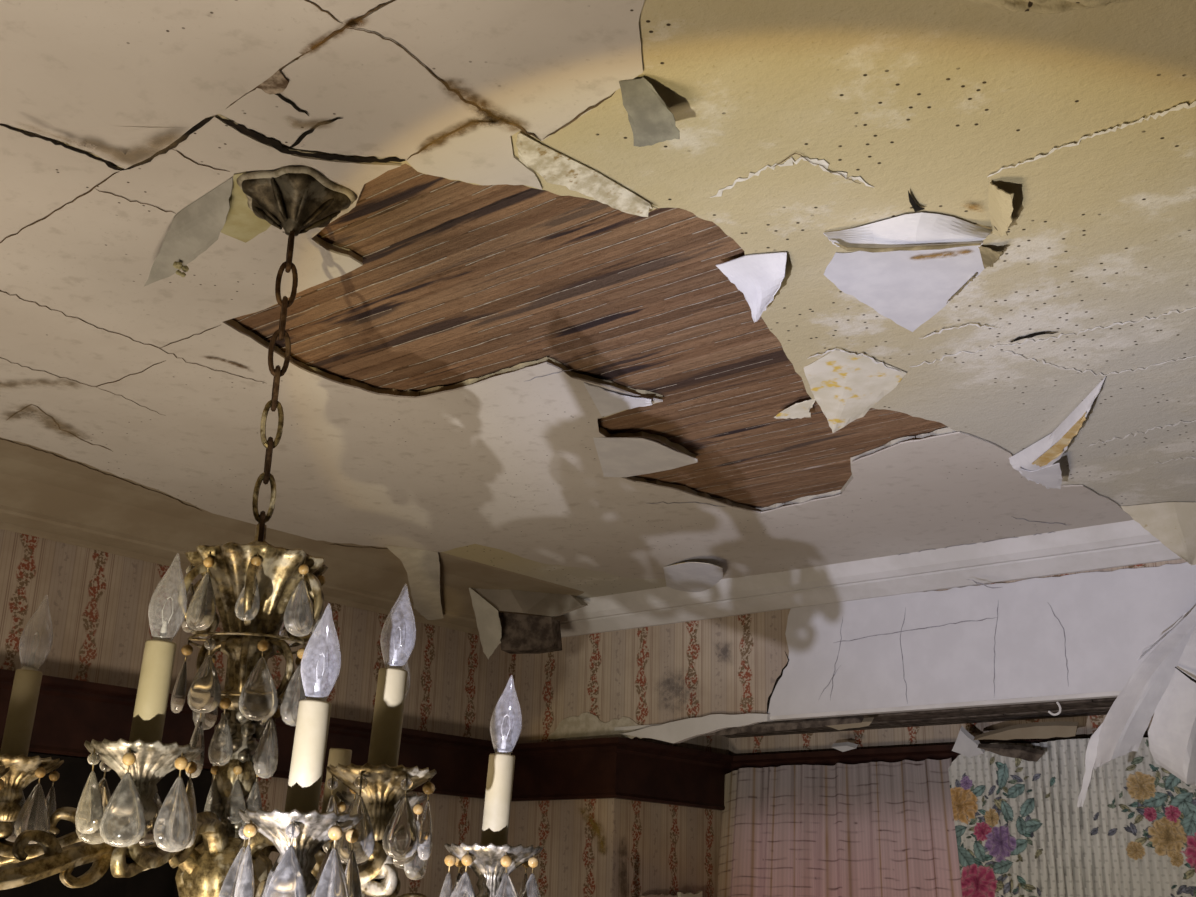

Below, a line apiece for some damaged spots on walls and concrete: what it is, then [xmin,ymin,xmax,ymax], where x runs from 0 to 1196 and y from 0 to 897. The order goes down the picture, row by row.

crack [0,0,616,243]
peeling [619,77,680,147]
crack [987,101,1196,177]
crack [908,191,925,212]
peeling [716,252,787,323]
peeling [823,182,1014,332]
crack [0,290,265,415]
peeling [774,349,907,433]
crack [809,307,1196,376]
crack [0,404,204,512]
peeling [593,437,698,477]
flaking render [767,502,1196,716]